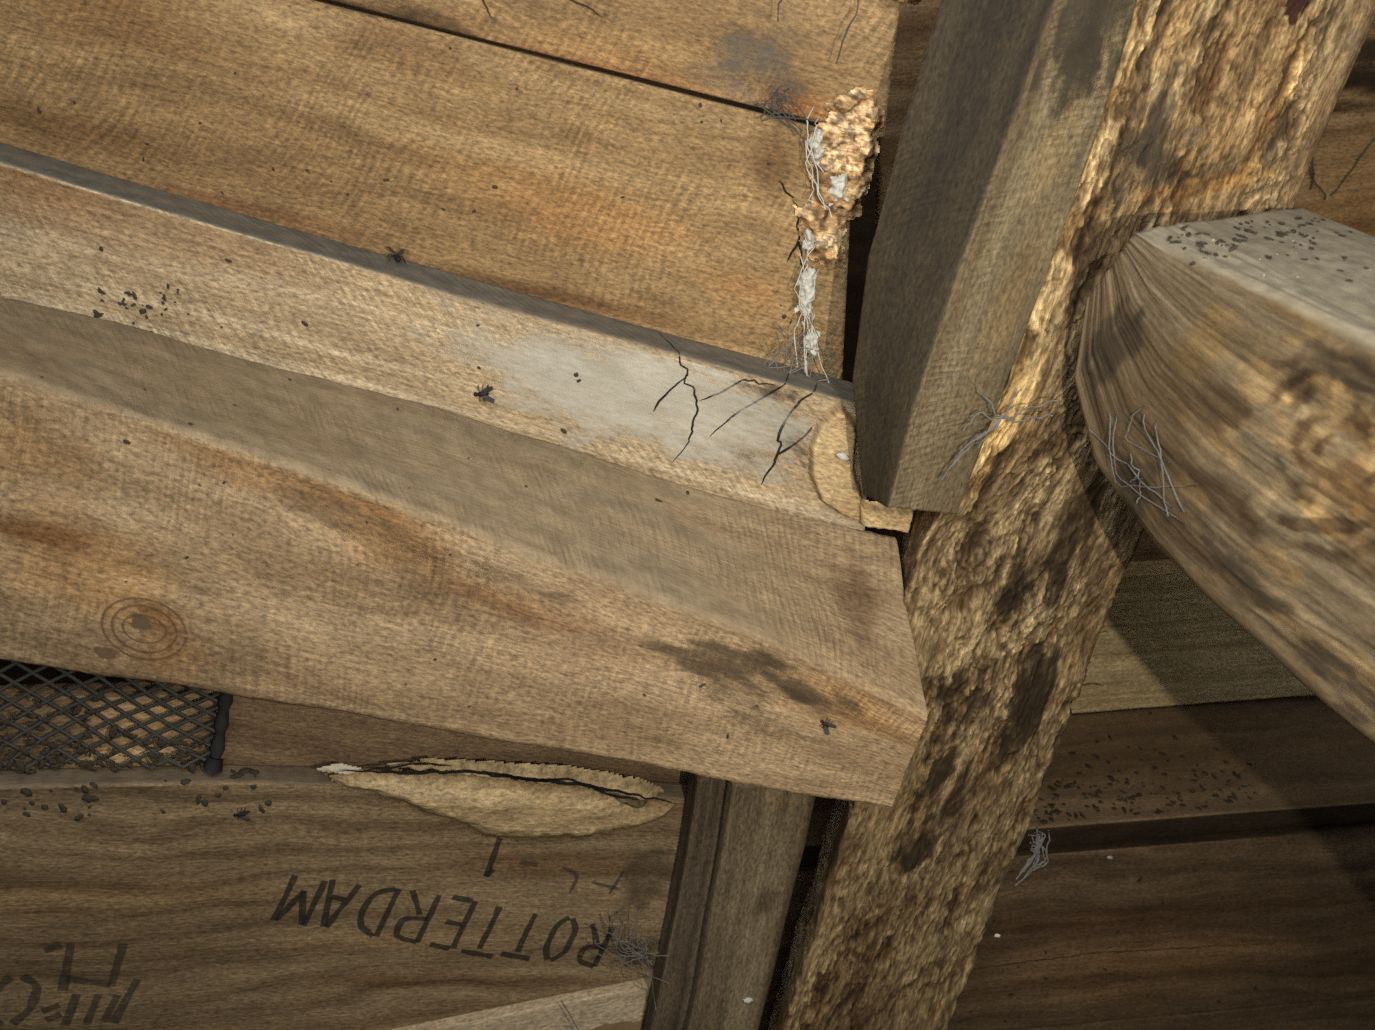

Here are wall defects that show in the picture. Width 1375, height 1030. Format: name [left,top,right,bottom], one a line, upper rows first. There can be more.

leakage [1334,22,1375,113]
crack [653,335,817,485]
leakage [997,468,1153,621]
leakage [937,665,988,713]
leakage [999,641,1059,762]
leakage [890,734,969,872]